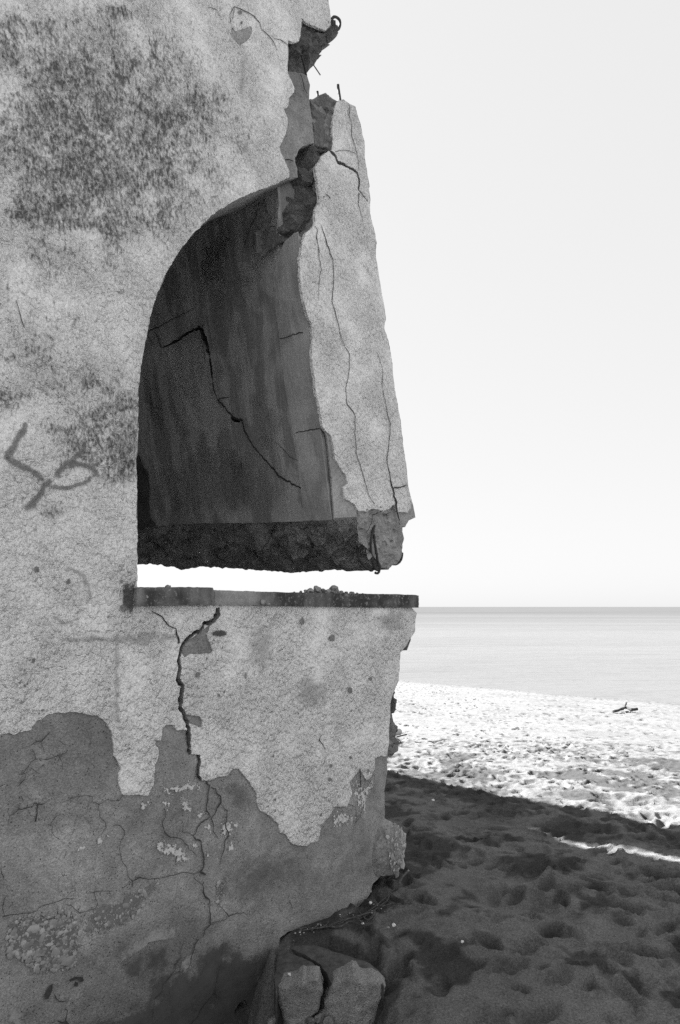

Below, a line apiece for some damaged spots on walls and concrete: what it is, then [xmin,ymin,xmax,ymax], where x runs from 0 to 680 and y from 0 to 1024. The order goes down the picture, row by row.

spalling [251,15,341,260]
crack [309,103,368,221]
crack [147,308,320,489]
spalling [136,433,403,573]
crack [315,225,406,531]
crack [0,607,247,1024]
peeling [0,691,407,1024]